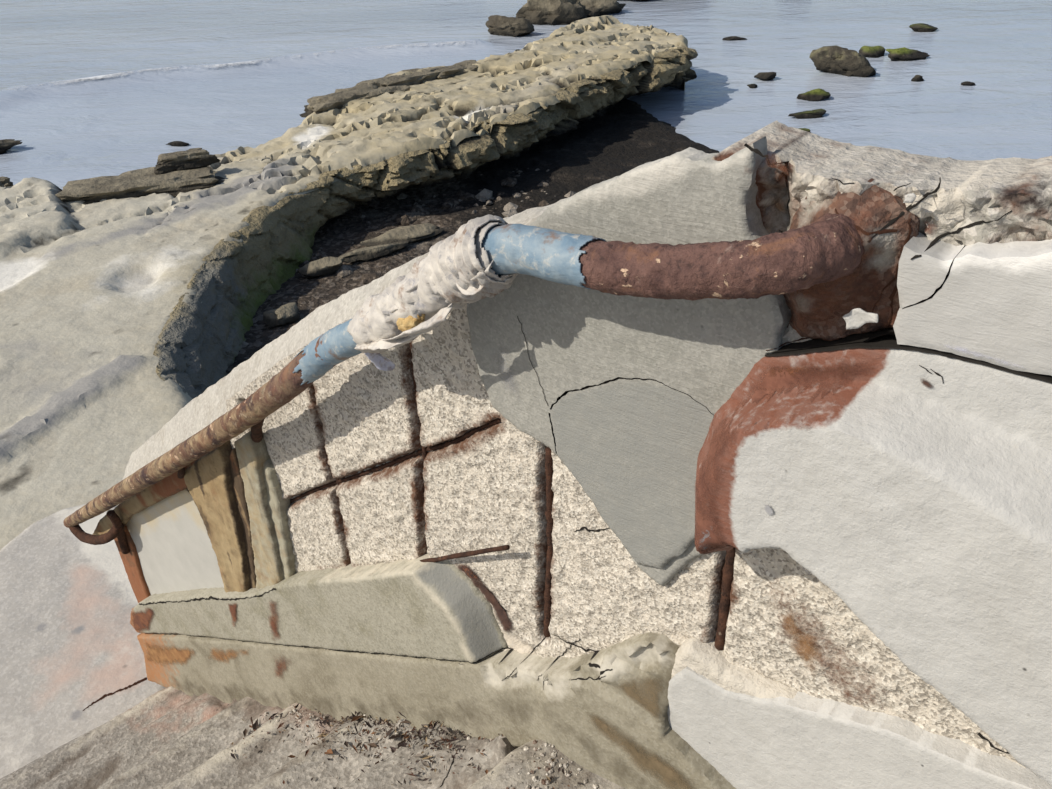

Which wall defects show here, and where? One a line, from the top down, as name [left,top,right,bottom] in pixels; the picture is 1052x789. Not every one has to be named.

corrosion [770,160,793,179]
spalling [712,120,1052,246]
crack [764,177,1052,384]
crack [517,316,714,453]
corrosion [742,366,867,407]
corrosion [695,421,738,554]
spalling [226,304,1026,768]
corrosion [133,609,154,631]
corrosion [458,565,512,632]
corrosion [147,645,193,664]
crack [190,635,612,690]